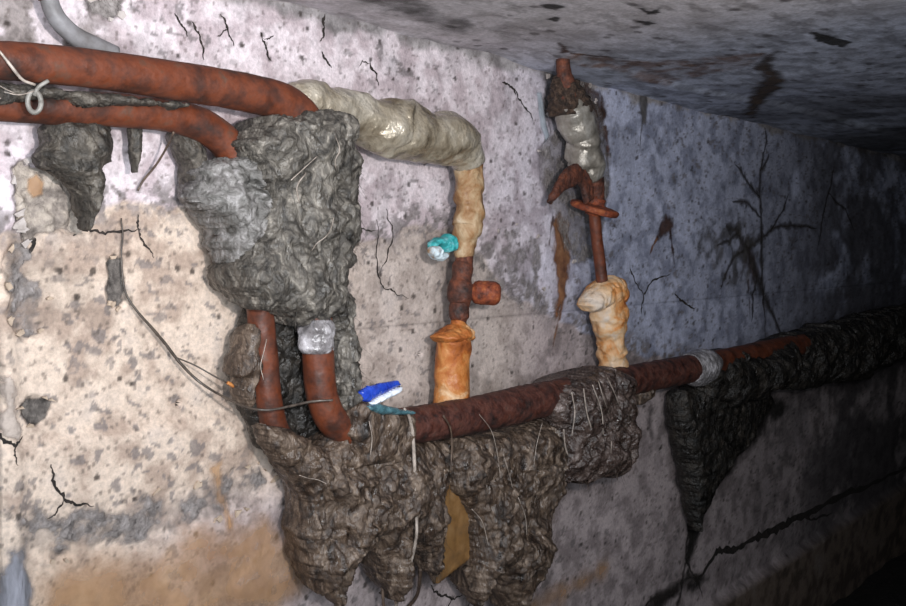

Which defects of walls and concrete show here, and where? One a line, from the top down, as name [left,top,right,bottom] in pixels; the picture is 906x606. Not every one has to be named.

spalling [4,157,82,338]
rust [549,212,570,344]
crack [718,129,855,338]
peeling [0,377,55,440]
crack [0,433,23,464]
crack [48,464,93,519]
leakage [138,527,296,606]
crack [431,585,470,606]
crack [646,467,906,606]